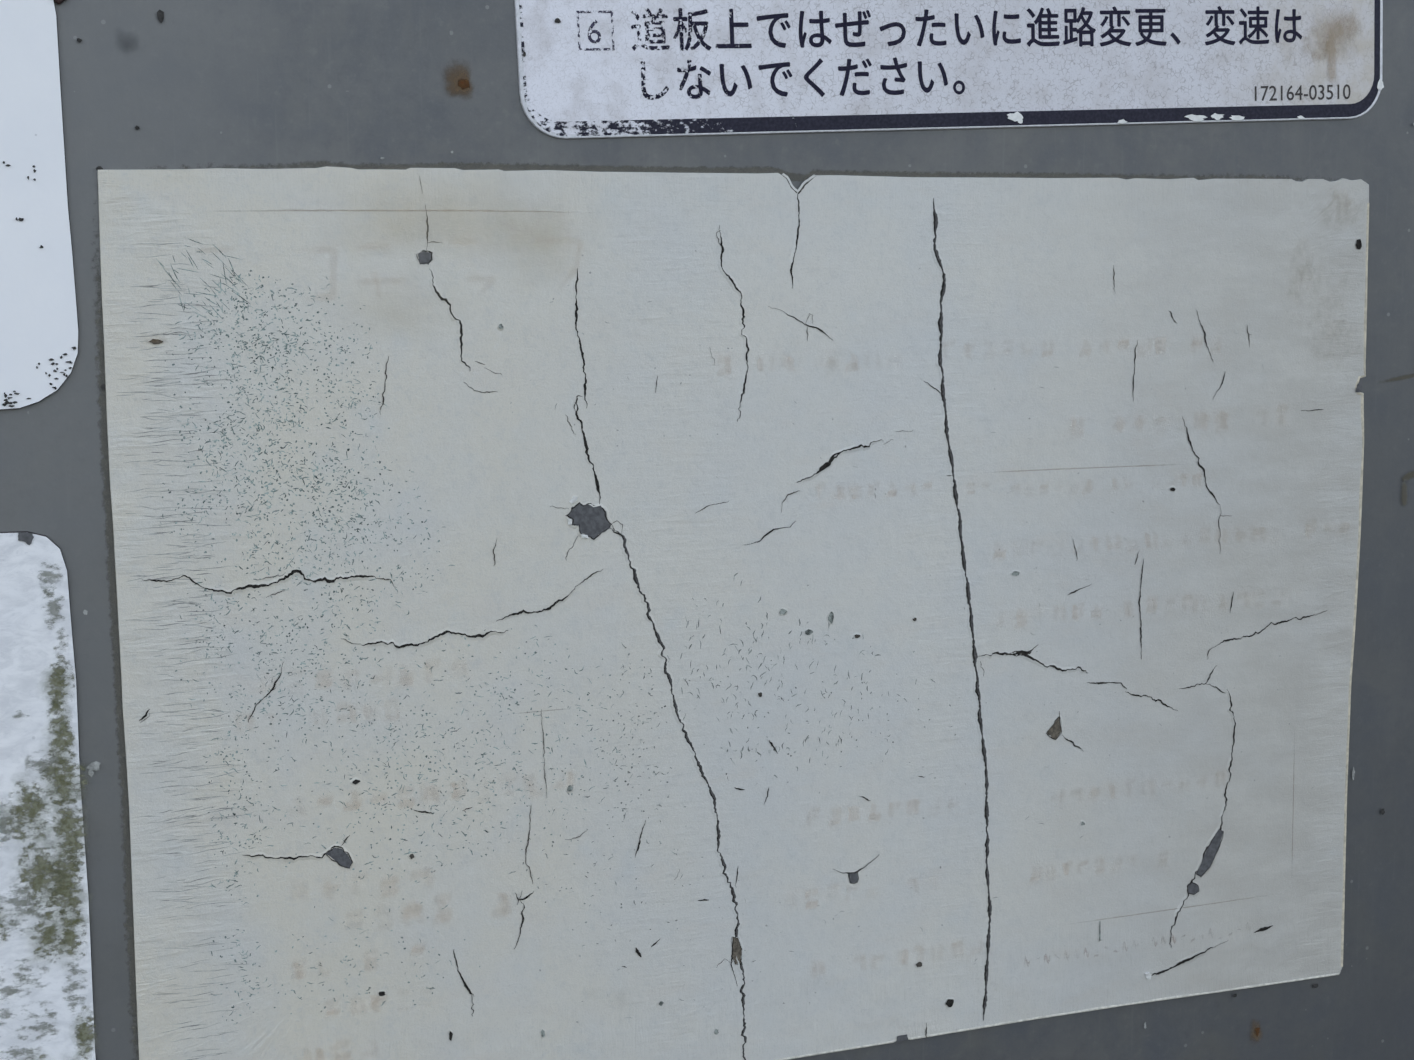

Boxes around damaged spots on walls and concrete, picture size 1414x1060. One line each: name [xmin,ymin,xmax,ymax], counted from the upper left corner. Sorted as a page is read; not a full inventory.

rust [447,66,472,95]
crack [116,176,1326,1060]